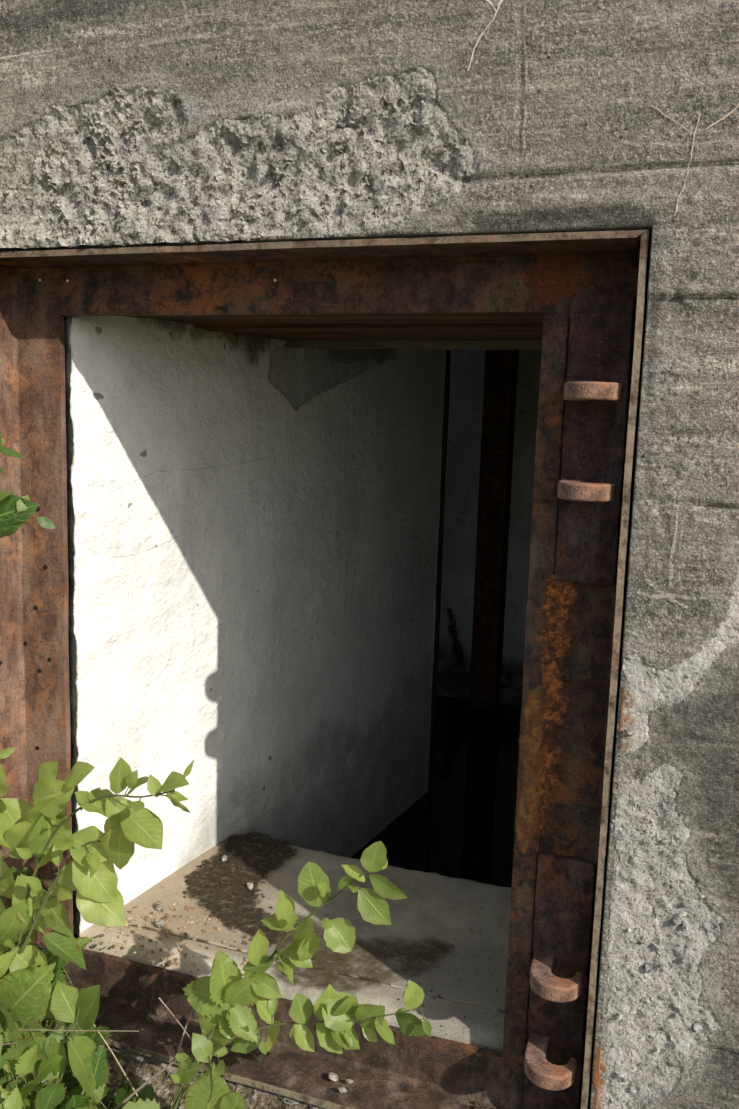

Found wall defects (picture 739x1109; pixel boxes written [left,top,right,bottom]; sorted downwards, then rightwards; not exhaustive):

crack [467,0,503,71]
spalling [0,67,487,249]
crack [651,105,739,216]
peeling [619,542,739,753]
corrosion [516,574,577,853]
corrosion [619,688,636,749]
spalling [598,763,723,1109]
spalling [98,1046,198,1109]
corrosion [594,1048,607,1109]